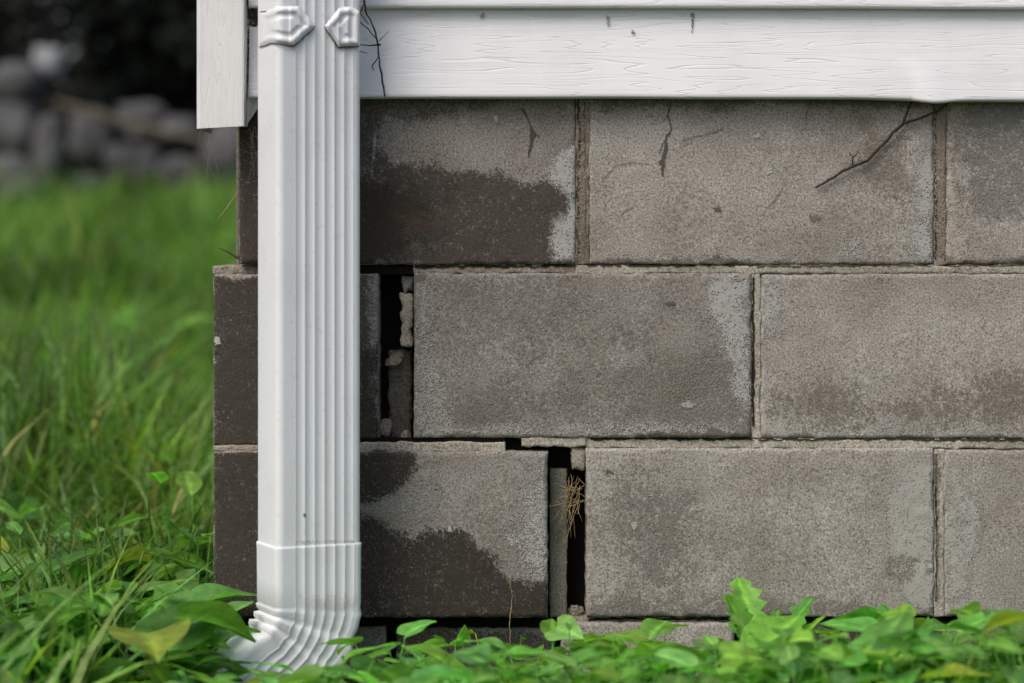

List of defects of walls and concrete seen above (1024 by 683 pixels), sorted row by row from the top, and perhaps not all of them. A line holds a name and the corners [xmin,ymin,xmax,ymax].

crack [359,99,1024,642]
water stain [360,99,1024,675]